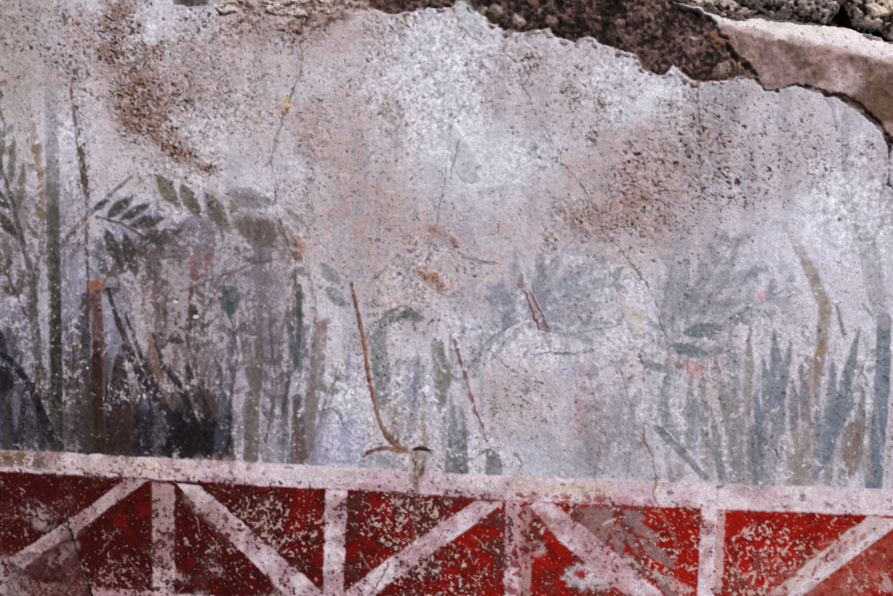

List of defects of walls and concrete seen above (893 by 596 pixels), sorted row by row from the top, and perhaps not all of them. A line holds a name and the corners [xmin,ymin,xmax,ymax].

peeling [74,139,97,206]
peeling [0,0,459,180]
crack [256,40,303,263]
crack [422,78,488,288]
peeling [459,0,893,255]
peeling [456,361,566,472]
flaking render [3,516,97,596]